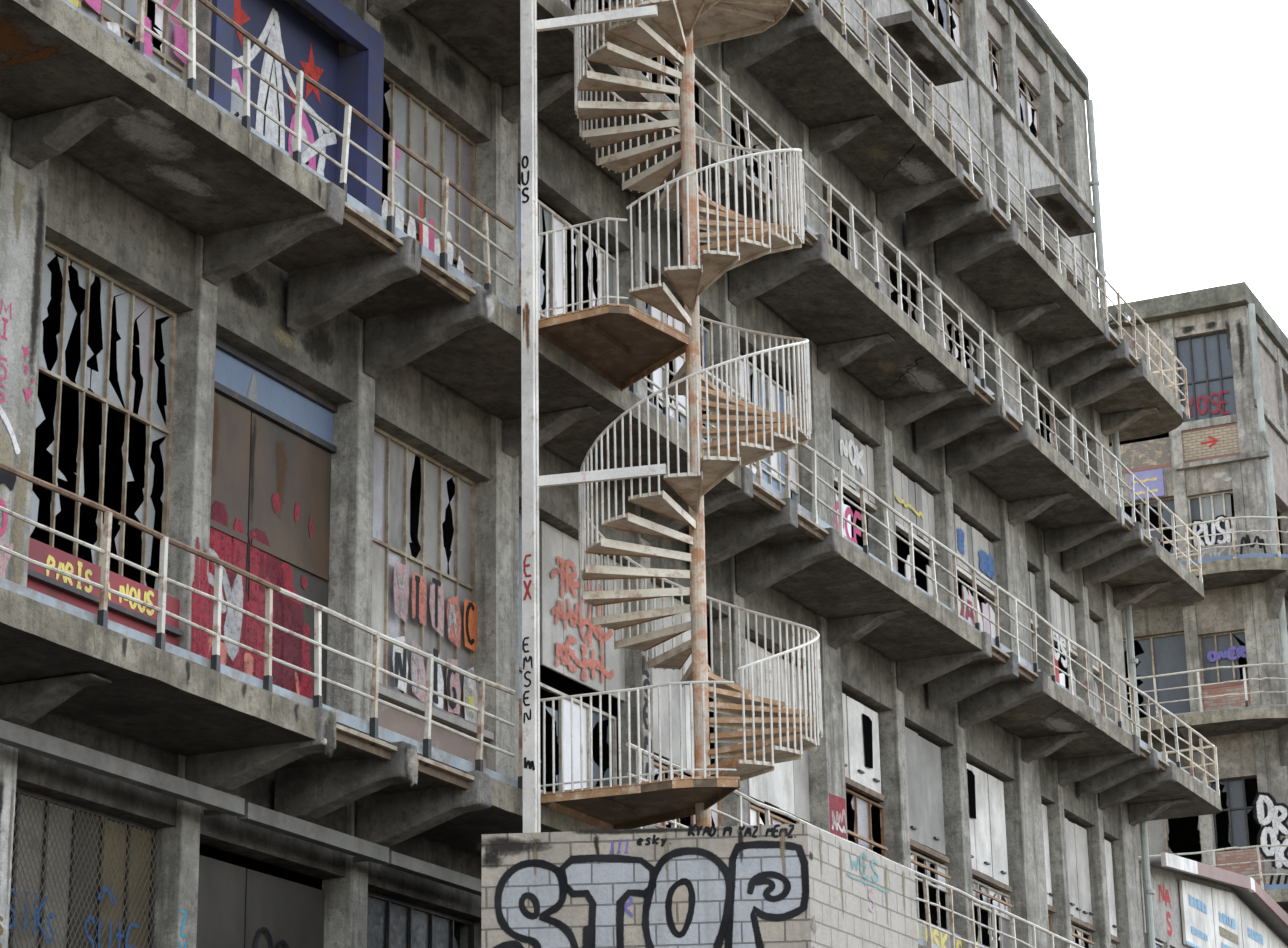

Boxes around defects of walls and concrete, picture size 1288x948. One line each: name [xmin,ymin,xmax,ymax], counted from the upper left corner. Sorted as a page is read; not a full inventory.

leakage [0,780,14,888]